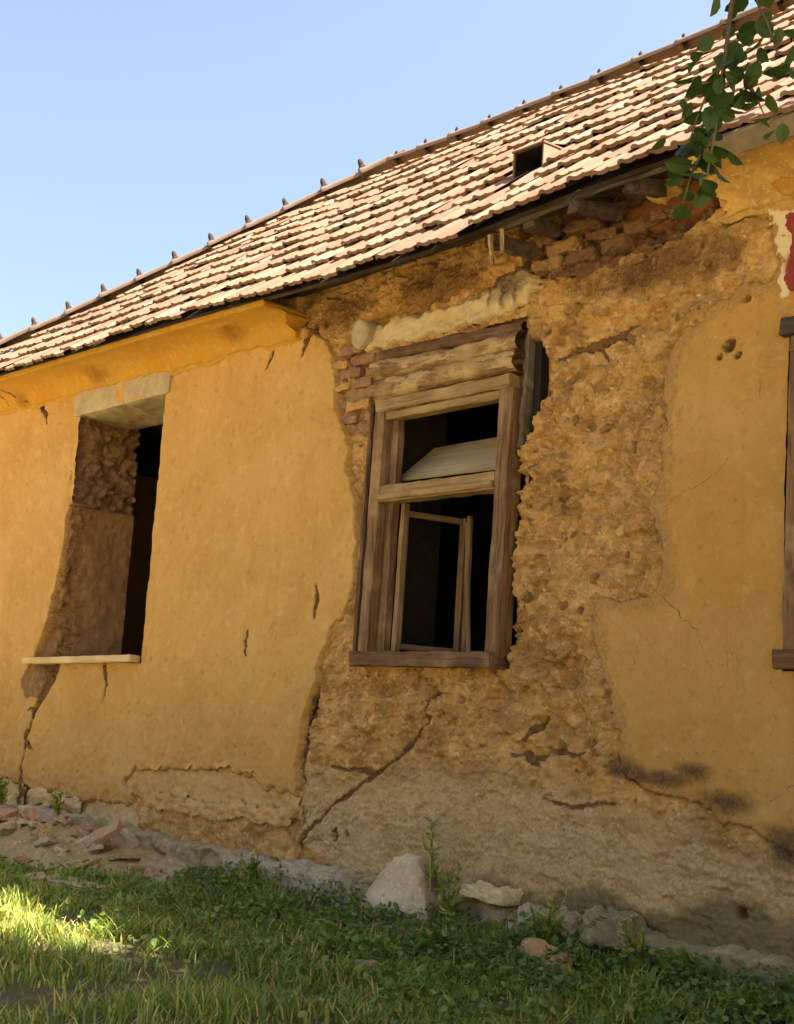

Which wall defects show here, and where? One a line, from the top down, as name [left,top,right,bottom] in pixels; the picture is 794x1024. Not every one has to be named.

crack [301,324,320,357]
spalling [79,176,794,956]
crack [312,585,320,618]
spalling [23,627,59,699]
crack [101,664,109,699]
crack [16,665,59,805]
crack [510,717,586,767]
spalling [0,776,52,807]
crack [299,686,441,850]
crack [542,797,616,810]
leakage [610,762,702,785]
leakage [301,769,794,957]